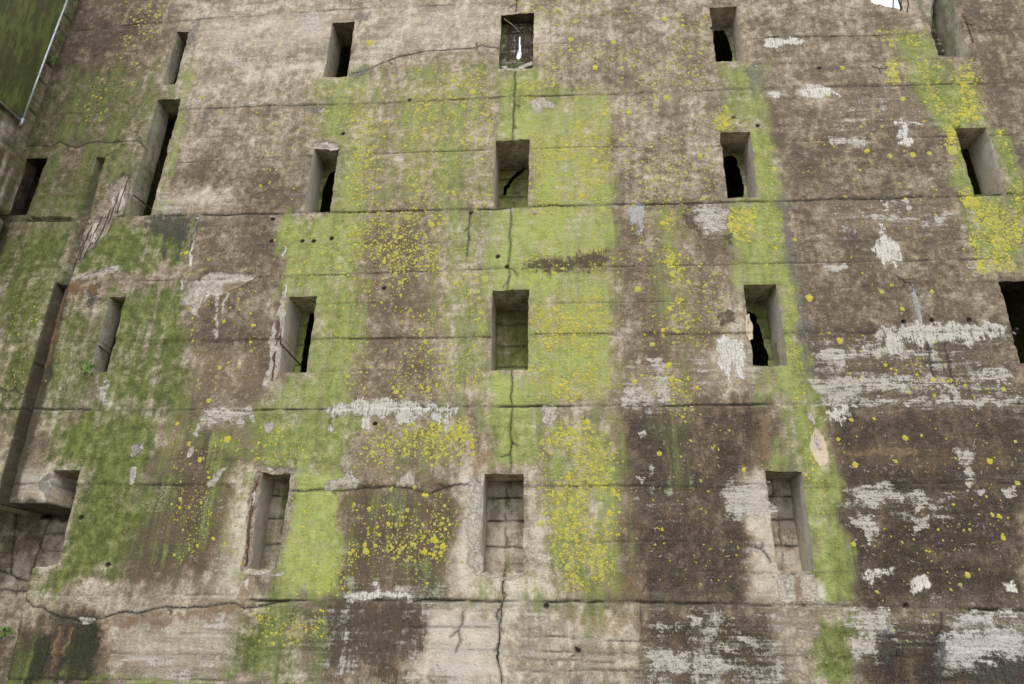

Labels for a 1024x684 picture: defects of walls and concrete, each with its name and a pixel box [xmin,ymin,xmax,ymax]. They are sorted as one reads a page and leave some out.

leakage [524,248,609,278]
spalling [181,271,256,338]
peeling [807,408,829,466]
crack [292,483,478,503]
crack [1,512,282,622]
leakage [23,614,101,684]
crack [496,575,507,682]